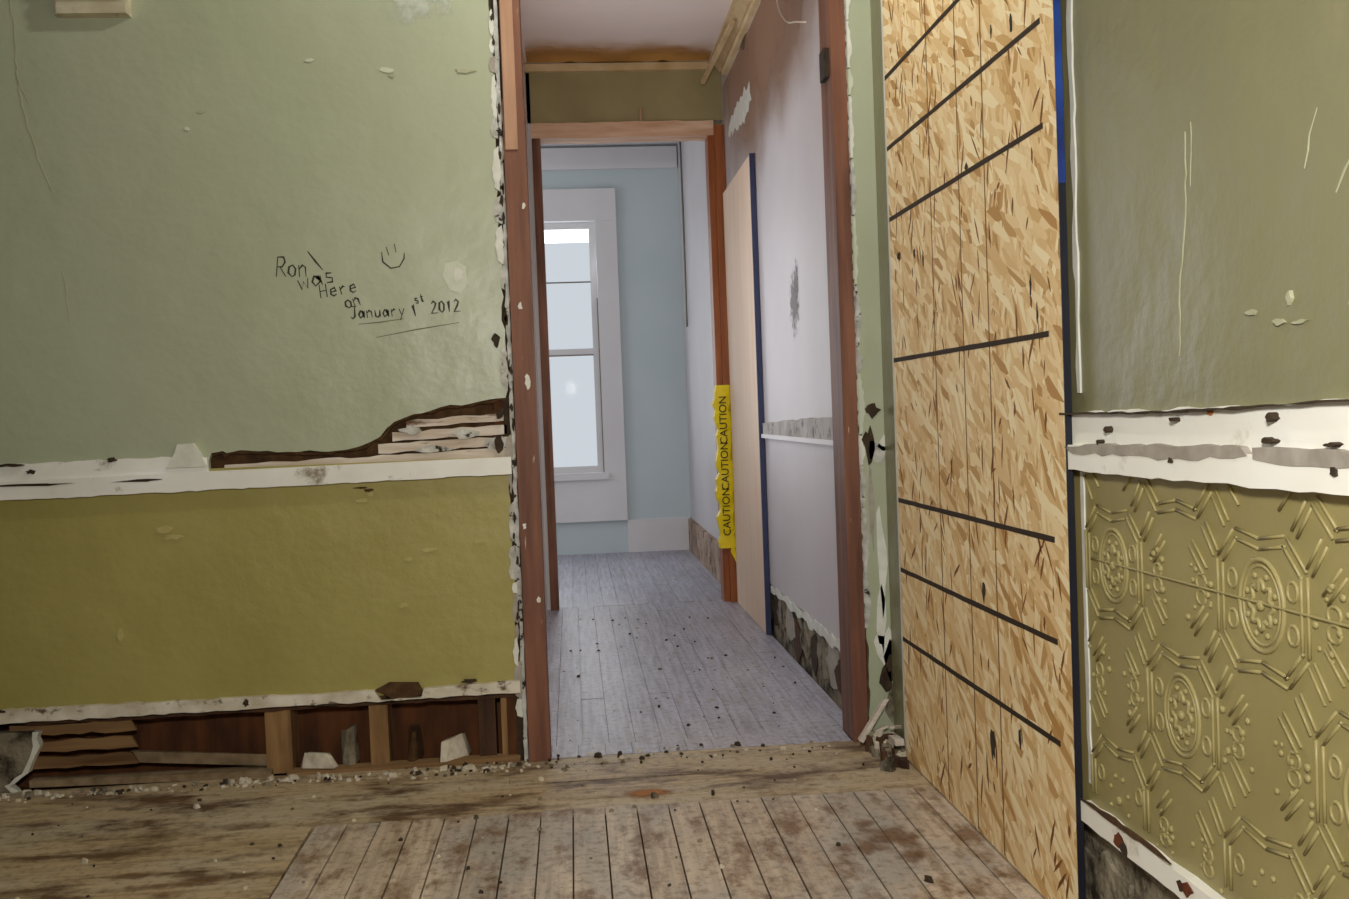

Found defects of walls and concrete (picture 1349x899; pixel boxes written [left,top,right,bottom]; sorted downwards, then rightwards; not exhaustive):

flaking render [212,346,508,457]
peeling [1065,437,1349,477]
spalling [0,434,526,793]
flaking render [1080,471,1093,784]
flaking render [1084,847,1134,899]
peeling [1080,798,1172,865]